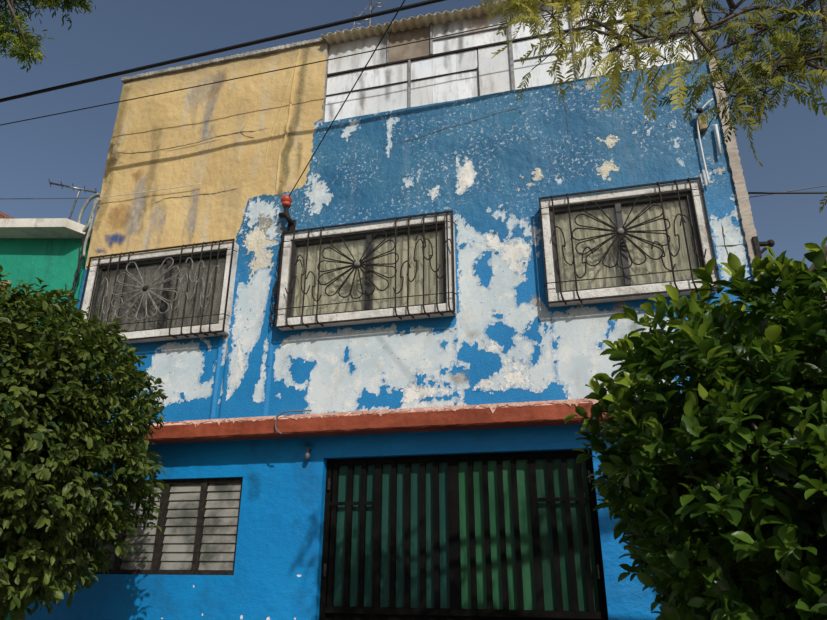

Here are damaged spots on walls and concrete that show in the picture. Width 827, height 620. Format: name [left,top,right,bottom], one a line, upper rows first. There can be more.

peeling [427,185,441,200]
peeling [443,151,477,195]
peeling [596,134,620,181]
peeling [709,194,750,281]
peeling [135,197,675,427]